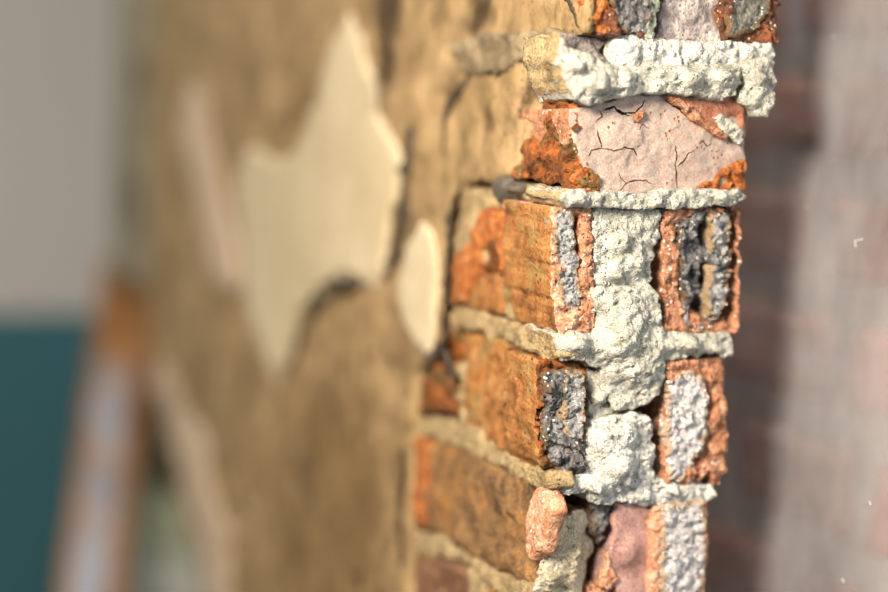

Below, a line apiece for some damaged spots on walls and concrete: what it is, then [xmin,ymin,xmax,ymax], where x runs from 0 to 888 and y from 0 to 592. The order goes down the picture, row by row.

crack [564,0,578,28]
spalling [714,0,781,44]
peeling [181,13,403,388]
spalling [511,97,600,192]
crack [589,99,687,156]
crack [675,140,712,188]
peeling [398,221,440,354]
spalling [451,200,596,334]
spalling [649,205,743,335]
spalling [503,347,589,475]
spalling [635,353,729,485]
spalling [525,487,709,592]